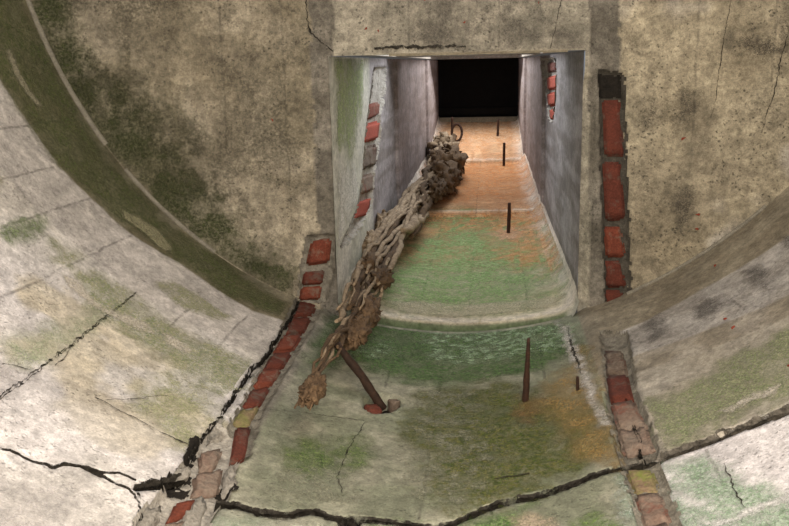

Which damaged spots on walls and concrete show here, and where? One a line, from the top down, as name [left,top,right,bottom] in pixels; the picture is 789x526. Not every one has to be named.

crack [305,0,333,52]
crack [568,328,581,373]
crack [2,300,300,525]
crack [305,412,364,492]
crack [214,425,646,526]
crack [724,464,746,508]